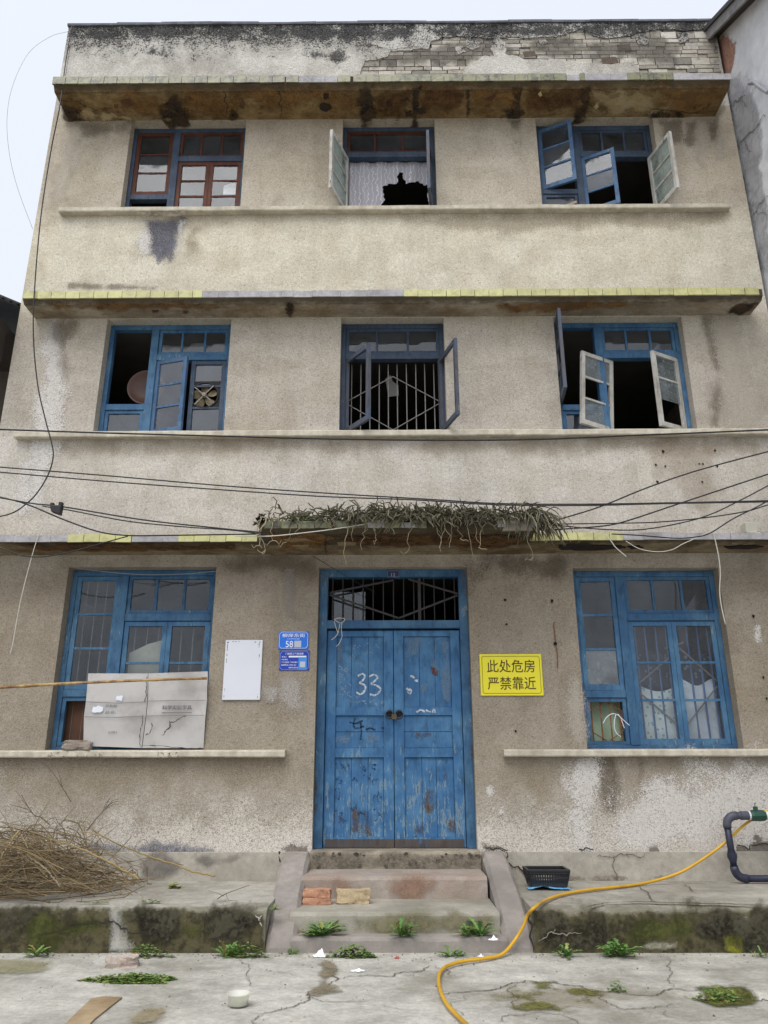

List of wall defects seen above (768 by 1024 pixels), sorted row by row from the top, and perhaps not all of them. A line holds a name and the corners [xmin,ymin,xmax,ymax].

flaking render [361,30,736,75]
water stain [61,94,190,129]
water stain [357,88,375,128]
crack [730,95,765,152]
water stain [134,210,186,263]
water stain [560,675,768,852]
crack [528,853,757,952]
water stain [90,908,138,968]
water stain [644,942,677,950]
crack [239,958,731,1024]